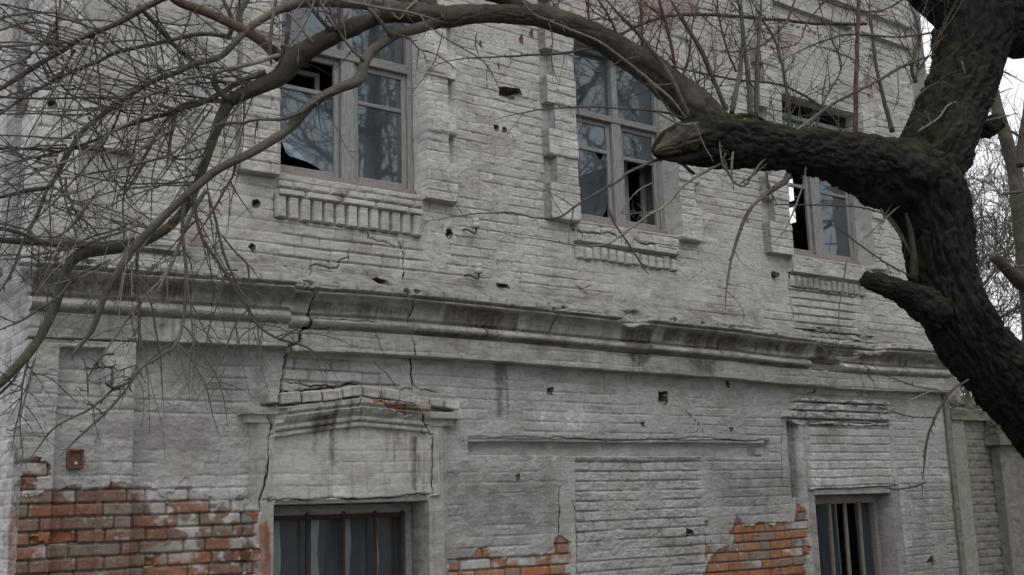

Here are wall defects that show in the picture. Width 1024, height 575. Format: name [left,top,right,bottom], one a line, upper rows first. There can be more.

crack [259,256,437,507]
peeling [366,397,421,417]
peeling [15,455,262,575]
peeling [446,535,573,575]
peeling [703,503,811,575]